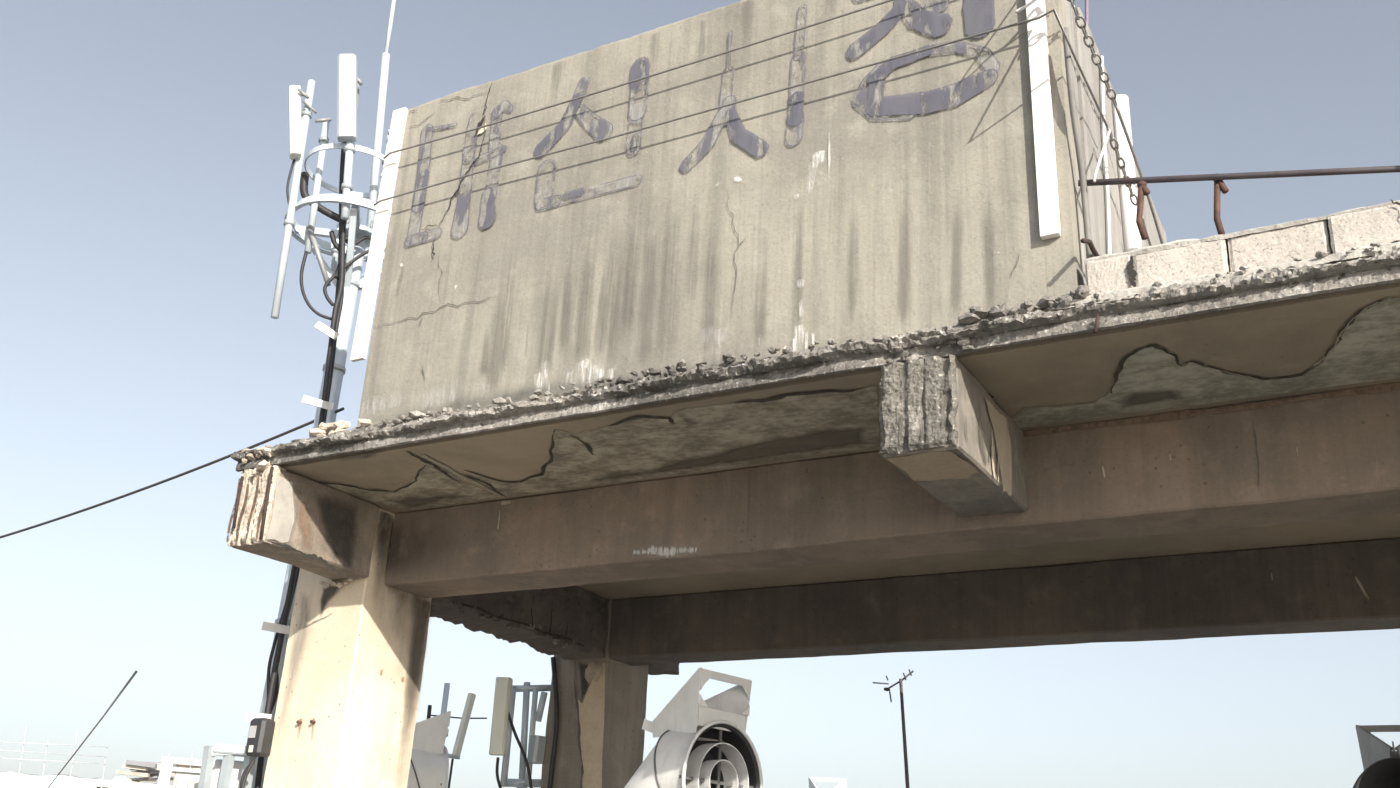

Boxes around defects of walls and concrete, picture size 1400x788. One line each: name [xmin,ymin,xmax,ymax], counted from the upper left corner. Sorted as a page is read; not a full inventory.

crack [378,84,497,327]
spalling [1215,265,1265,278]
spalling [1294,242,1396,262]
peeling [309,285,1101,510]
peeling [986,297,1400,496]
peeling [226,445,295,543]
crack [407,452,506,497]